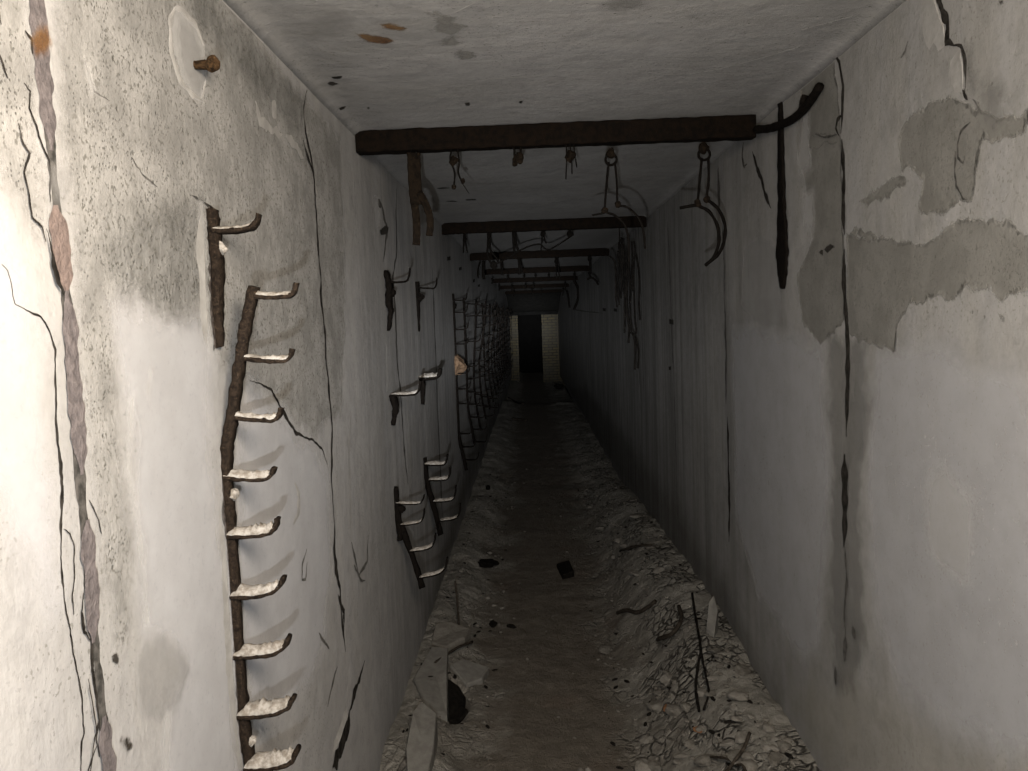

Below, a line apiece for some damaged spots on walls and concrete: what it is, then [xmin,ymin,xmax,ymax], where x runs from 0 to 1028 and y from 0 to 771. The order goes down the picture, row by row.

crack [0,18,33,54]
crack [0,55,64,295]
corrosion [33,29,50,53]
corrosion [360,24,405,44]
peeling [797,63,1028,353]
crack [901,0,981,200]
crack [1,264,100,771]
crack [250,91,369,770]